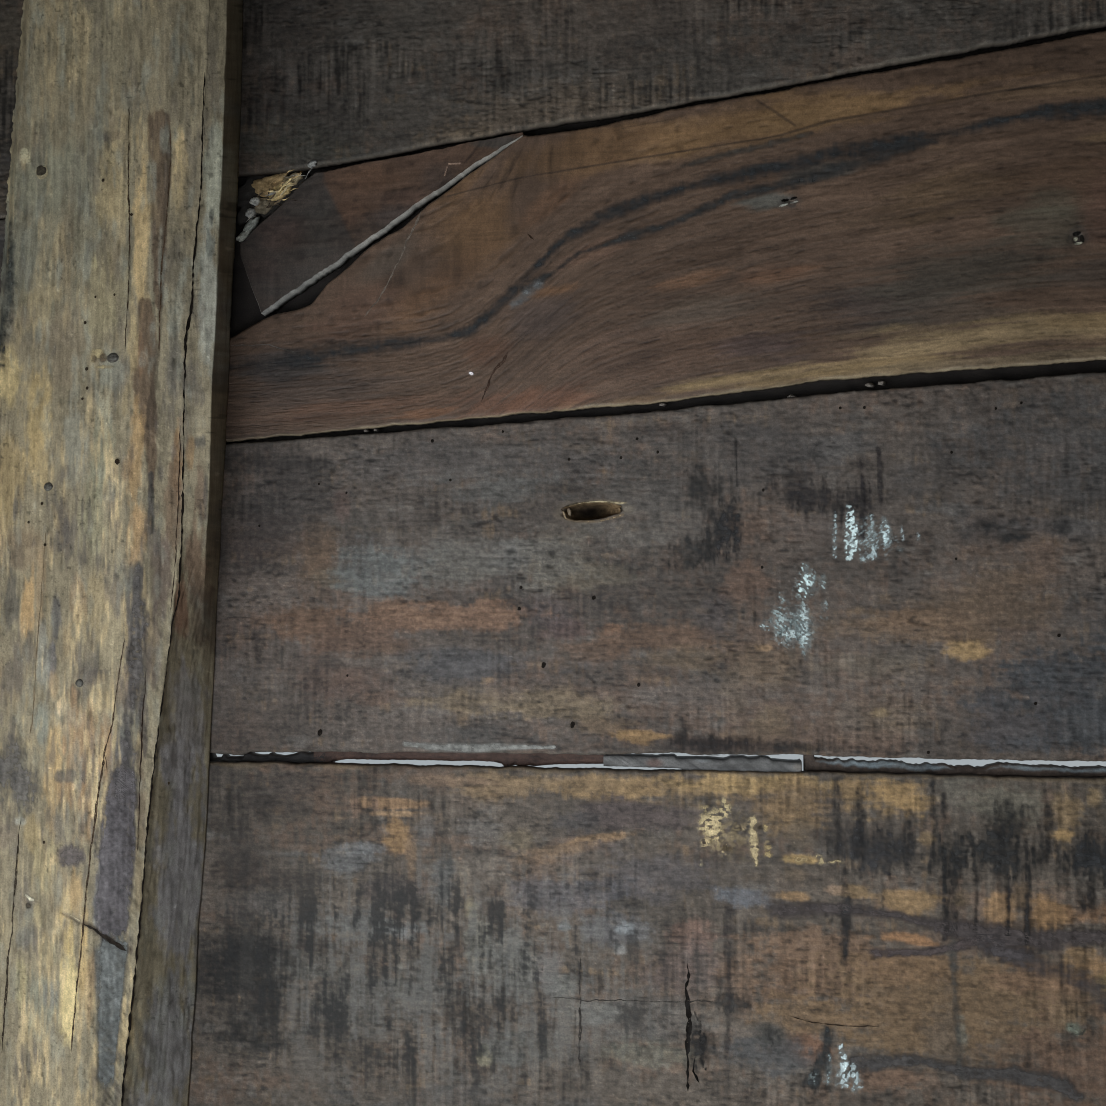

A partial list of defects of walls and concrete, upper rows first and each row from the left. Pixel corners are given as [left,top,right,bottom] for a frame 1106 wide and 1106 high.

crack [71,73,206,1106]
crack [2,821,21,1050]
crack [554,958,717,1090]